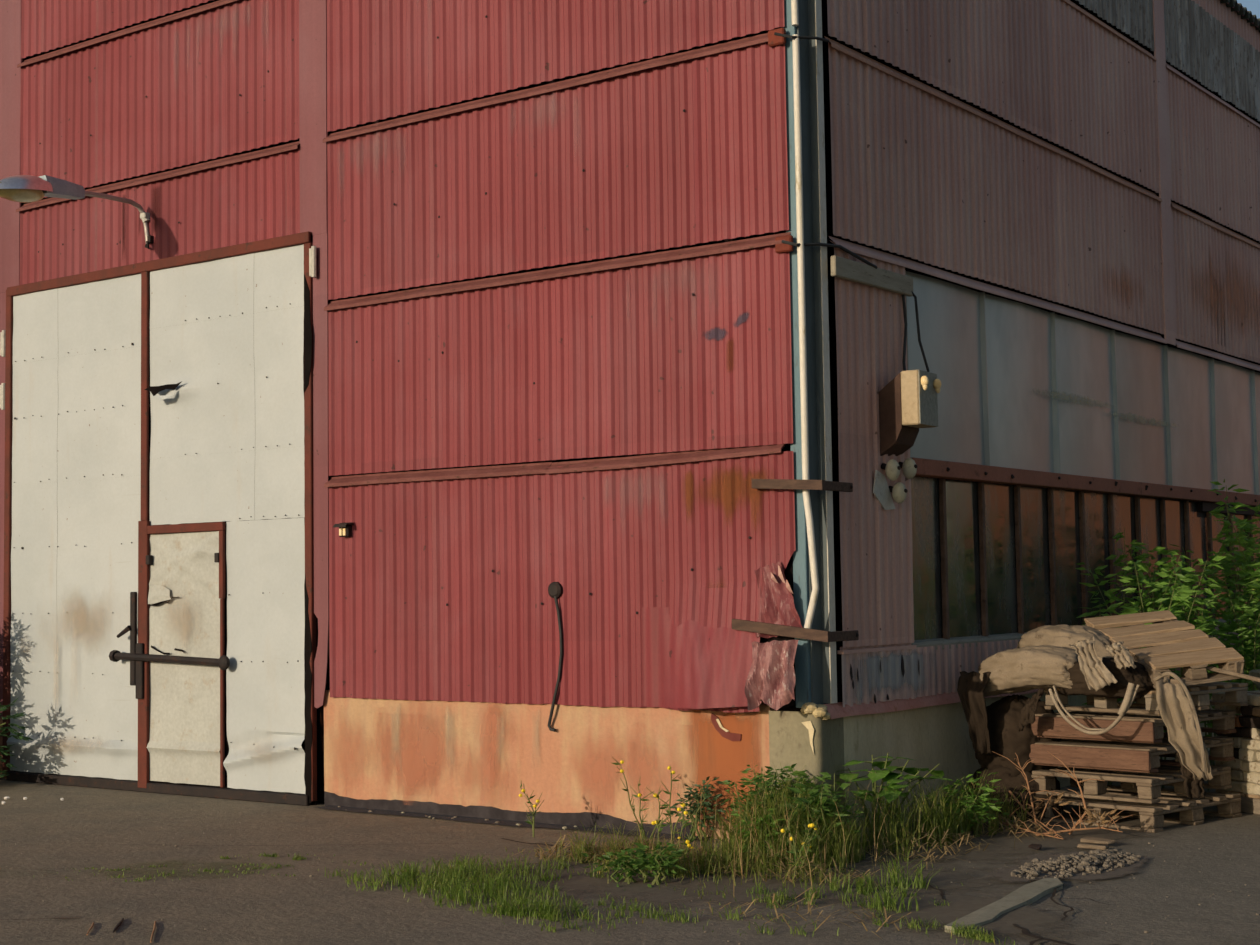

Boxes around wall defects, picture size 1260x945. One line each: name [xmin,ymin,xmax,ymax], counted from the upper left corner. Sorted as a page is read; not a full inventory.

peeling [771,565,793,594]
rust [693,712,759,825]